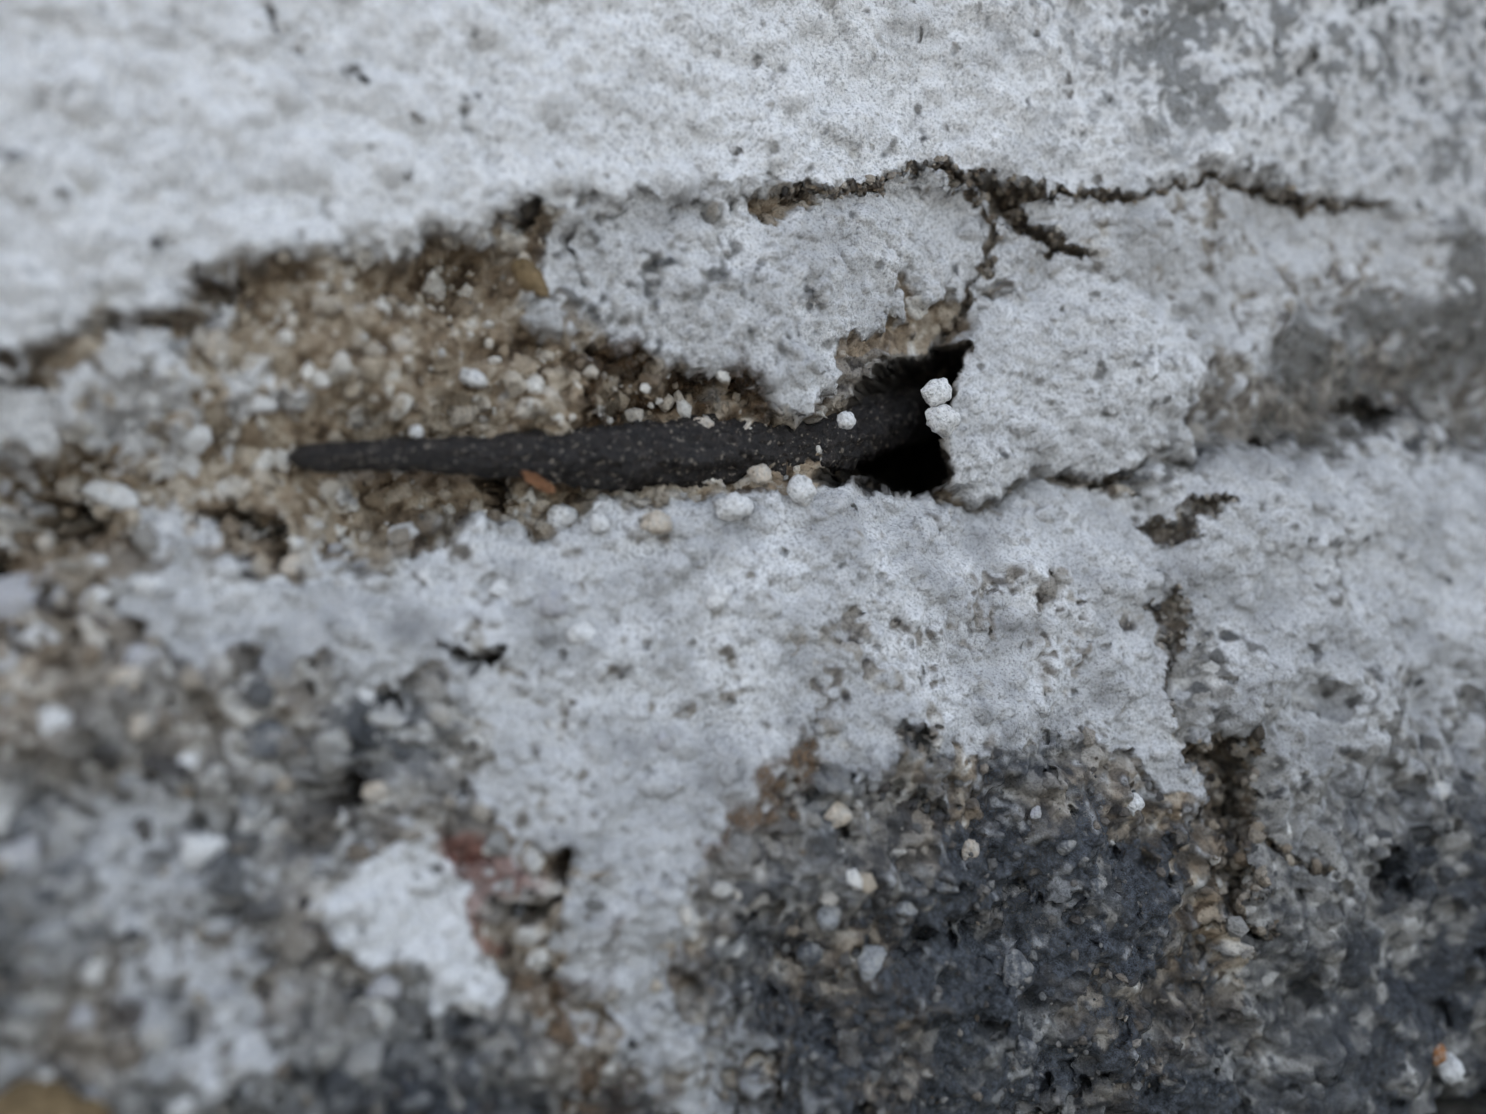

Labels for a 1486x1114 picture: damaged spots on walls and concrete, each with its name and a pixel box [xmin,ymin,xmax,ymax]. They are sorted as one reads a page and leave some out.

peeling [522,184,1020,428]
crack [779,154,1391,343]
peeling [0,434,1274,1114]
spalling [1369,843,1417,902]
spalling [1432,1043,1466,1086]